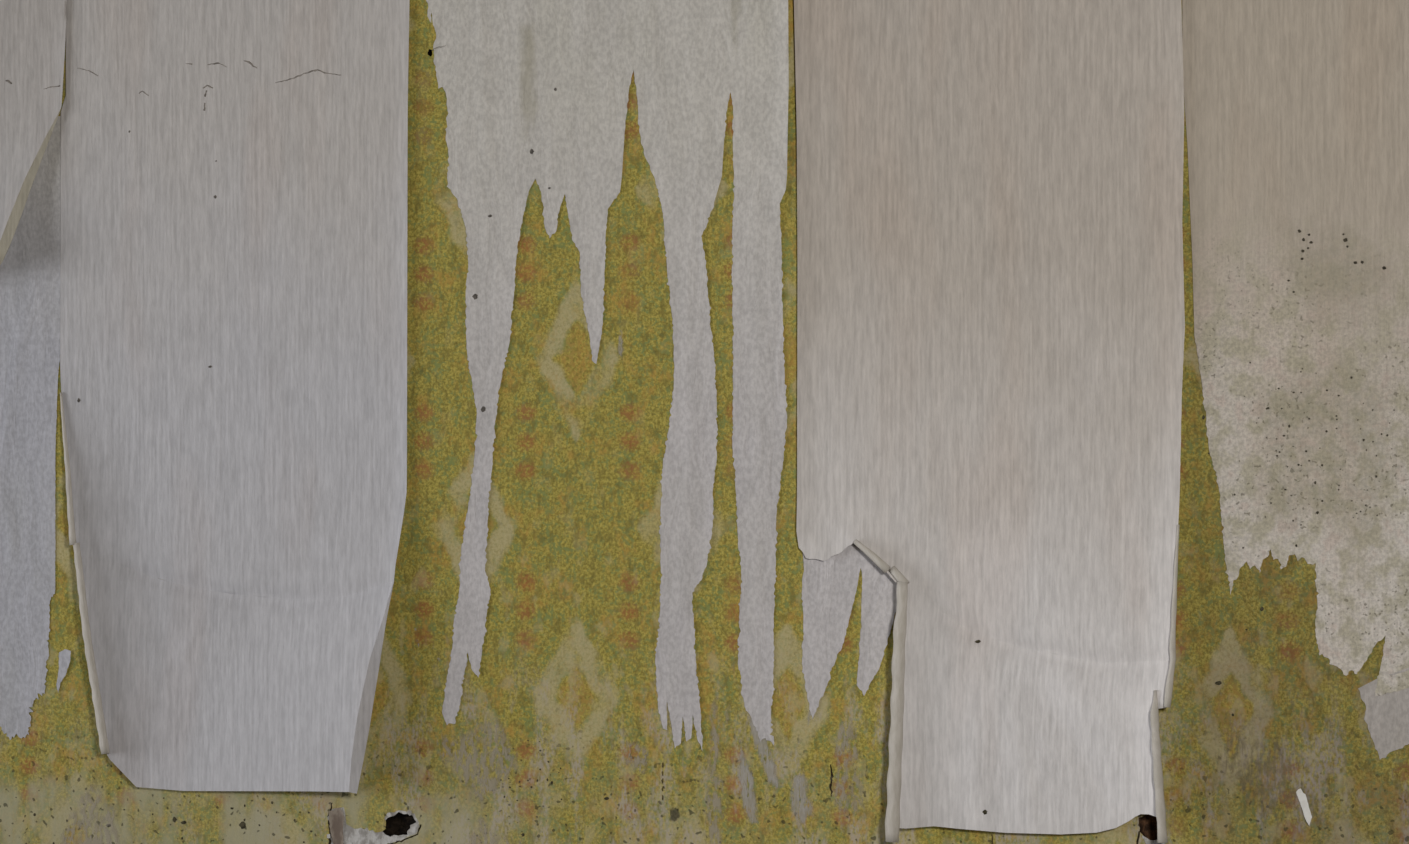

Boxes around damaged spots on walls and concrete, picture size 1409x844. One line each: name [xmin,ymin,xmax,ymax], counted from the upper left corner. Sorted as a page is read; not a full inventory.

peeling [0,0,421,844]
peeling [794,0,1409,844]